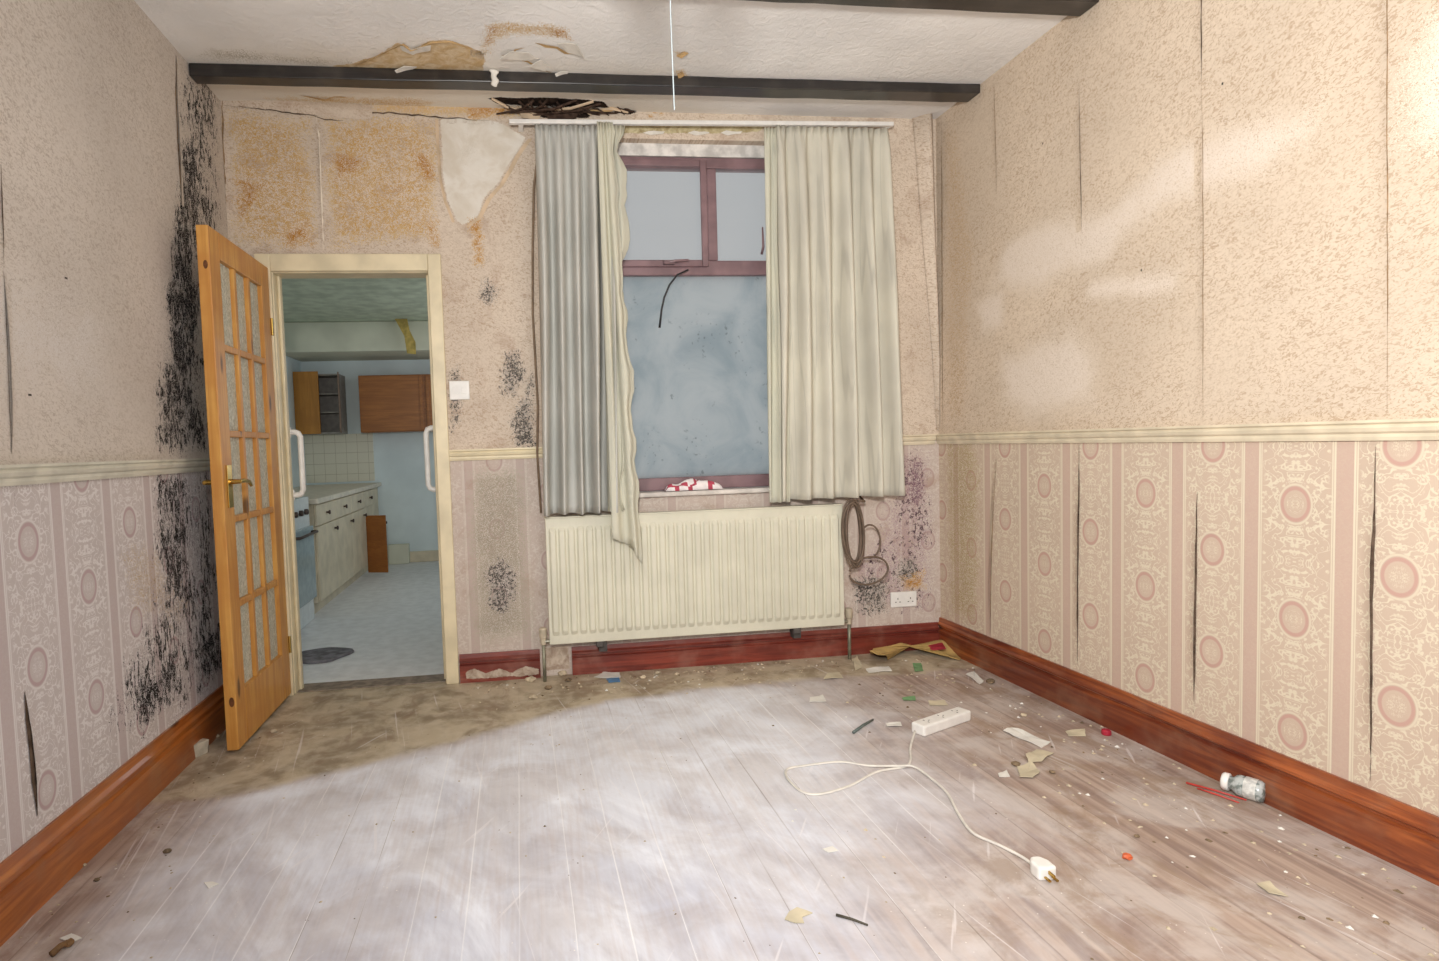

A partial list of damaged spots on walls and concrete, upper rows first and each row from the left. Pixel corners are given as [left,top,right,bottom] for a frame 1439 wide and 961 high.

crack [1,169,18,453]
leakage [109,73,520,739]
flaking render [333,40,499,87]
peeling [435,117,532,227]
leakage [460,350,570,671]
crack [1072,445,1080,663]
leakage [848,90,1337,626]
crack [1186,491,1197,712]
crack [1192,0,1204,420]
crack [1357,0,1388,780]
crack [25,689,45,816]